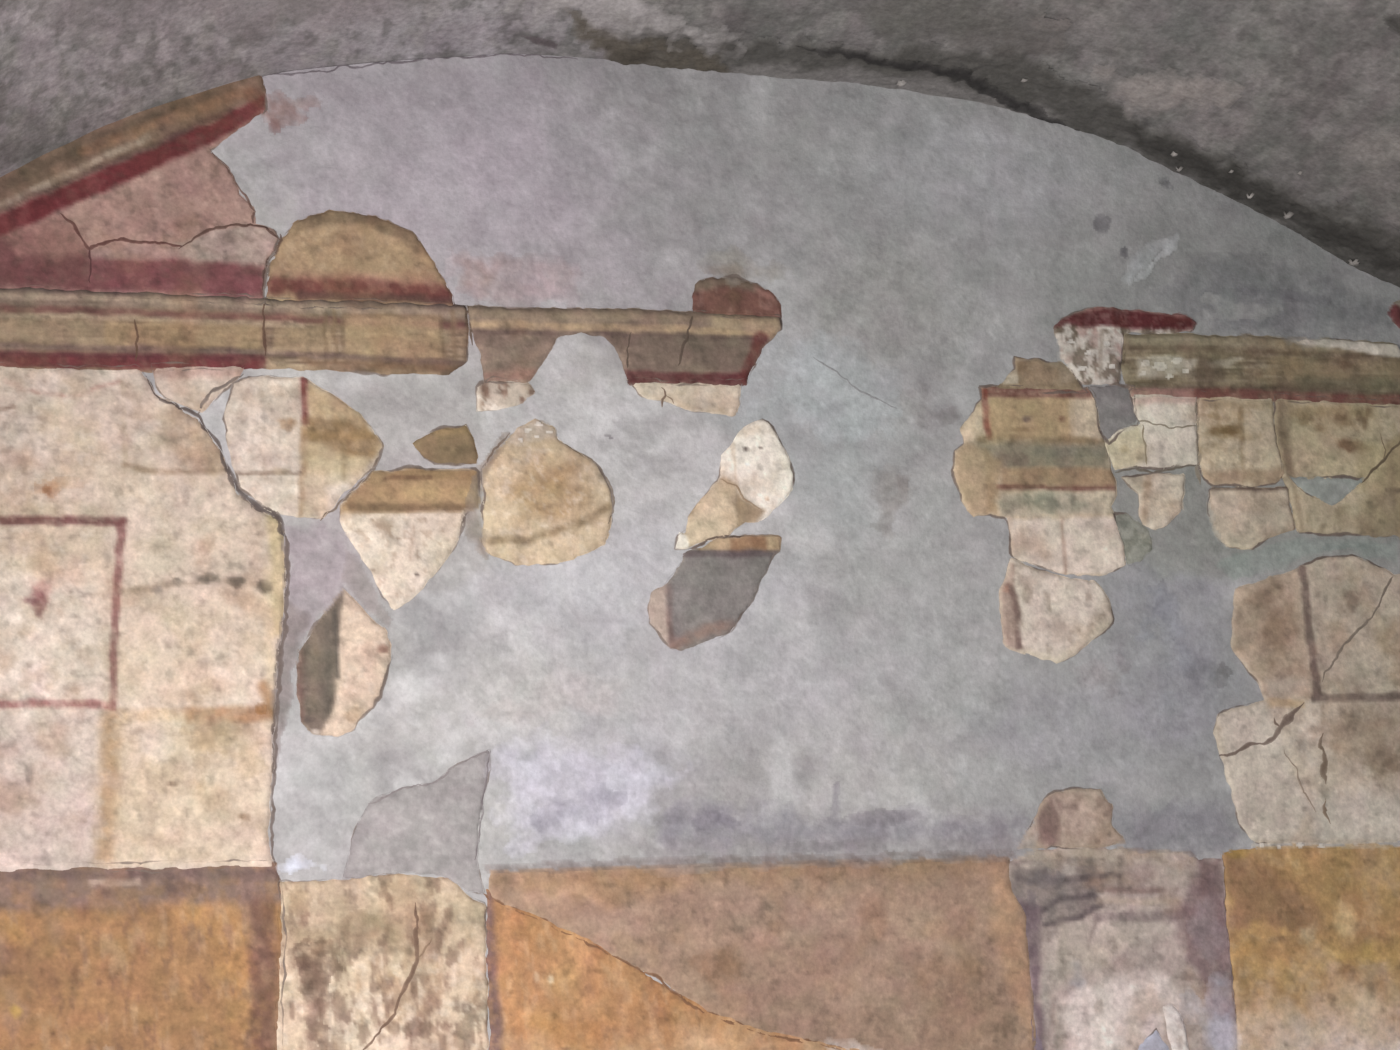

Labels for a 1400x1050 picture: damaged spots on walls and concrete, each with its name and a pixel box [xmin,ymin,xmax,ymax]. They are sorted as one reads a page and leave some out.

spalling [722,31,1400,288]
crack [60,149,291,863]
crack [320,452,383,521]
flaking render [475,376,536,412]
peeling [518,420,557,443]
peeling [1056,328,1199,383]
peeling [1296,339,1400,356]
crack [1219,576,1393,824]
crack [368,750,491,860]
spalling [1251,840,1400,851]
crack [363,902,432,1050]
crack [484,894,842,1050]